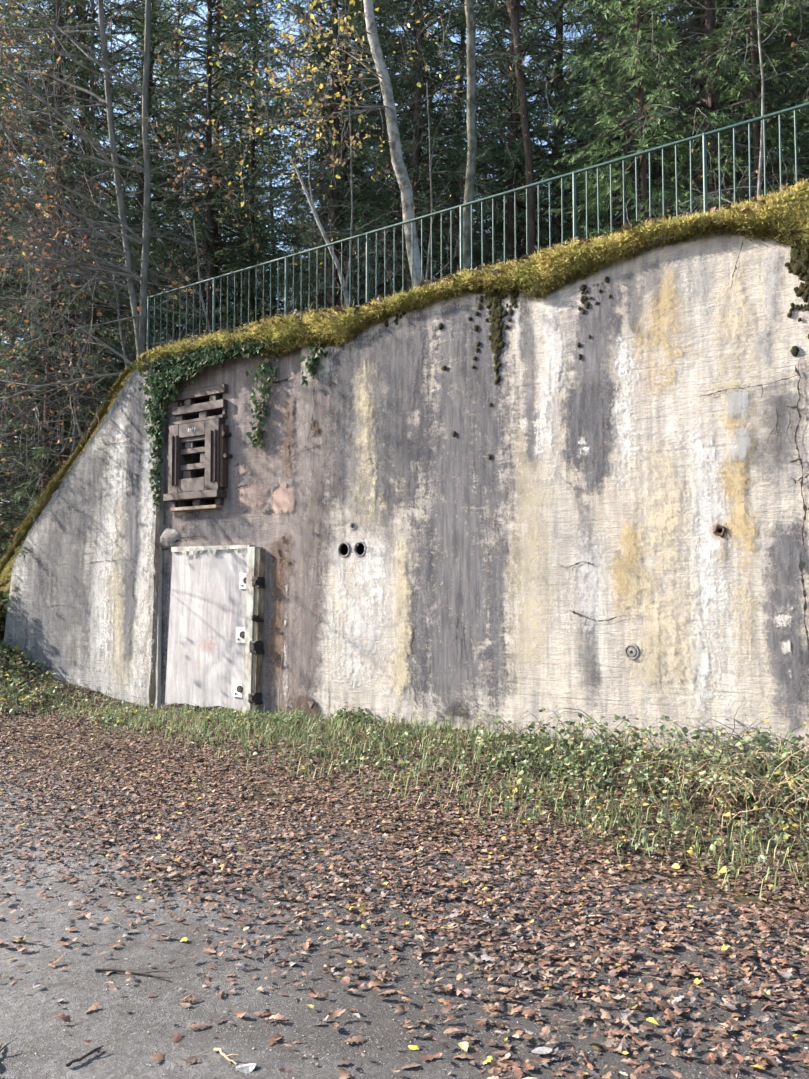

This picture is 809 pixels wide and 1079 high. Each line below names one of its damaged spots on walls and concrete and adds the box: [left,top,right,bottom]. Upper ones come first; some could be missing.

leakage [7,373,172,695]
spalling [234,396,295,514]
leakage [283,249,809,729]
crack [699,363,809,651]